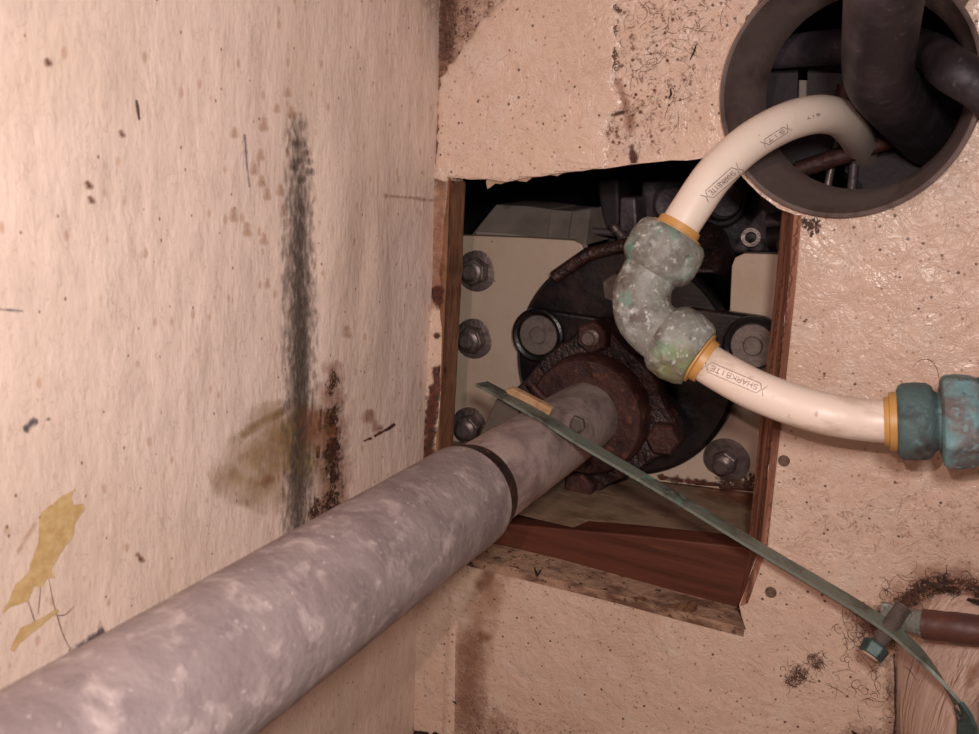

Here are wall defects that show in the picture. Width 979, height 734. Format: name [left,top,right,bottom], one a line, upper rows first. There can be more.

peeling [486,177,533,189]
water stain [250,201,319,518]